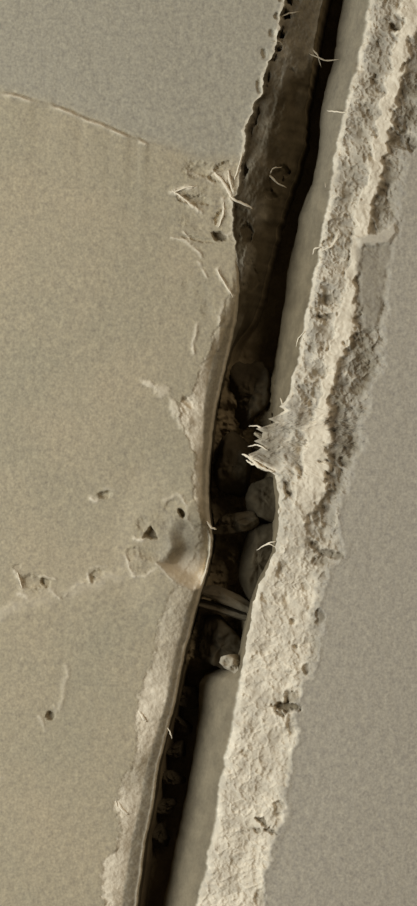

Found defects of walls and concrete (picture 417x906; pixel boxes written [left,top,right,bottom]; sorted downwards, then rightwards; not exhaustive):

peeling [138,153,253,495]
crack [137,0,371,906]
flaking render [197,0,417,906]